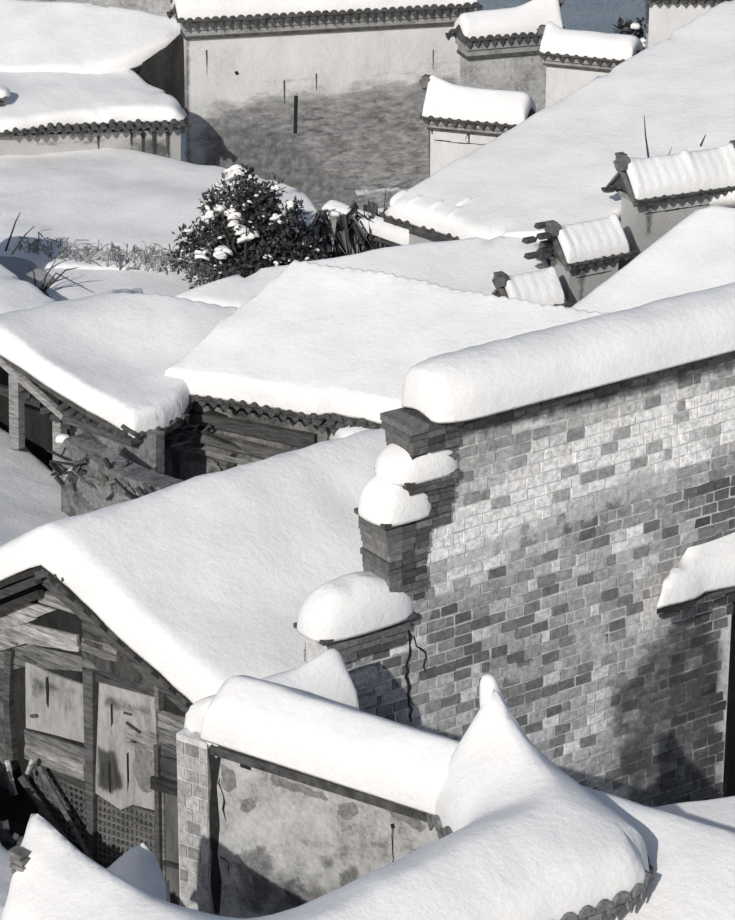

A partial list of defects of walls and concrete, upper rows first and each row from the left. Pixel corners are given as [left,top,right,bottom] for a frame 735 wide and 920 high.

crack [404,630,427,722]
crack [208,749,230,913]
leakage [235,848,271,913]
leakage [277,880,324,910]